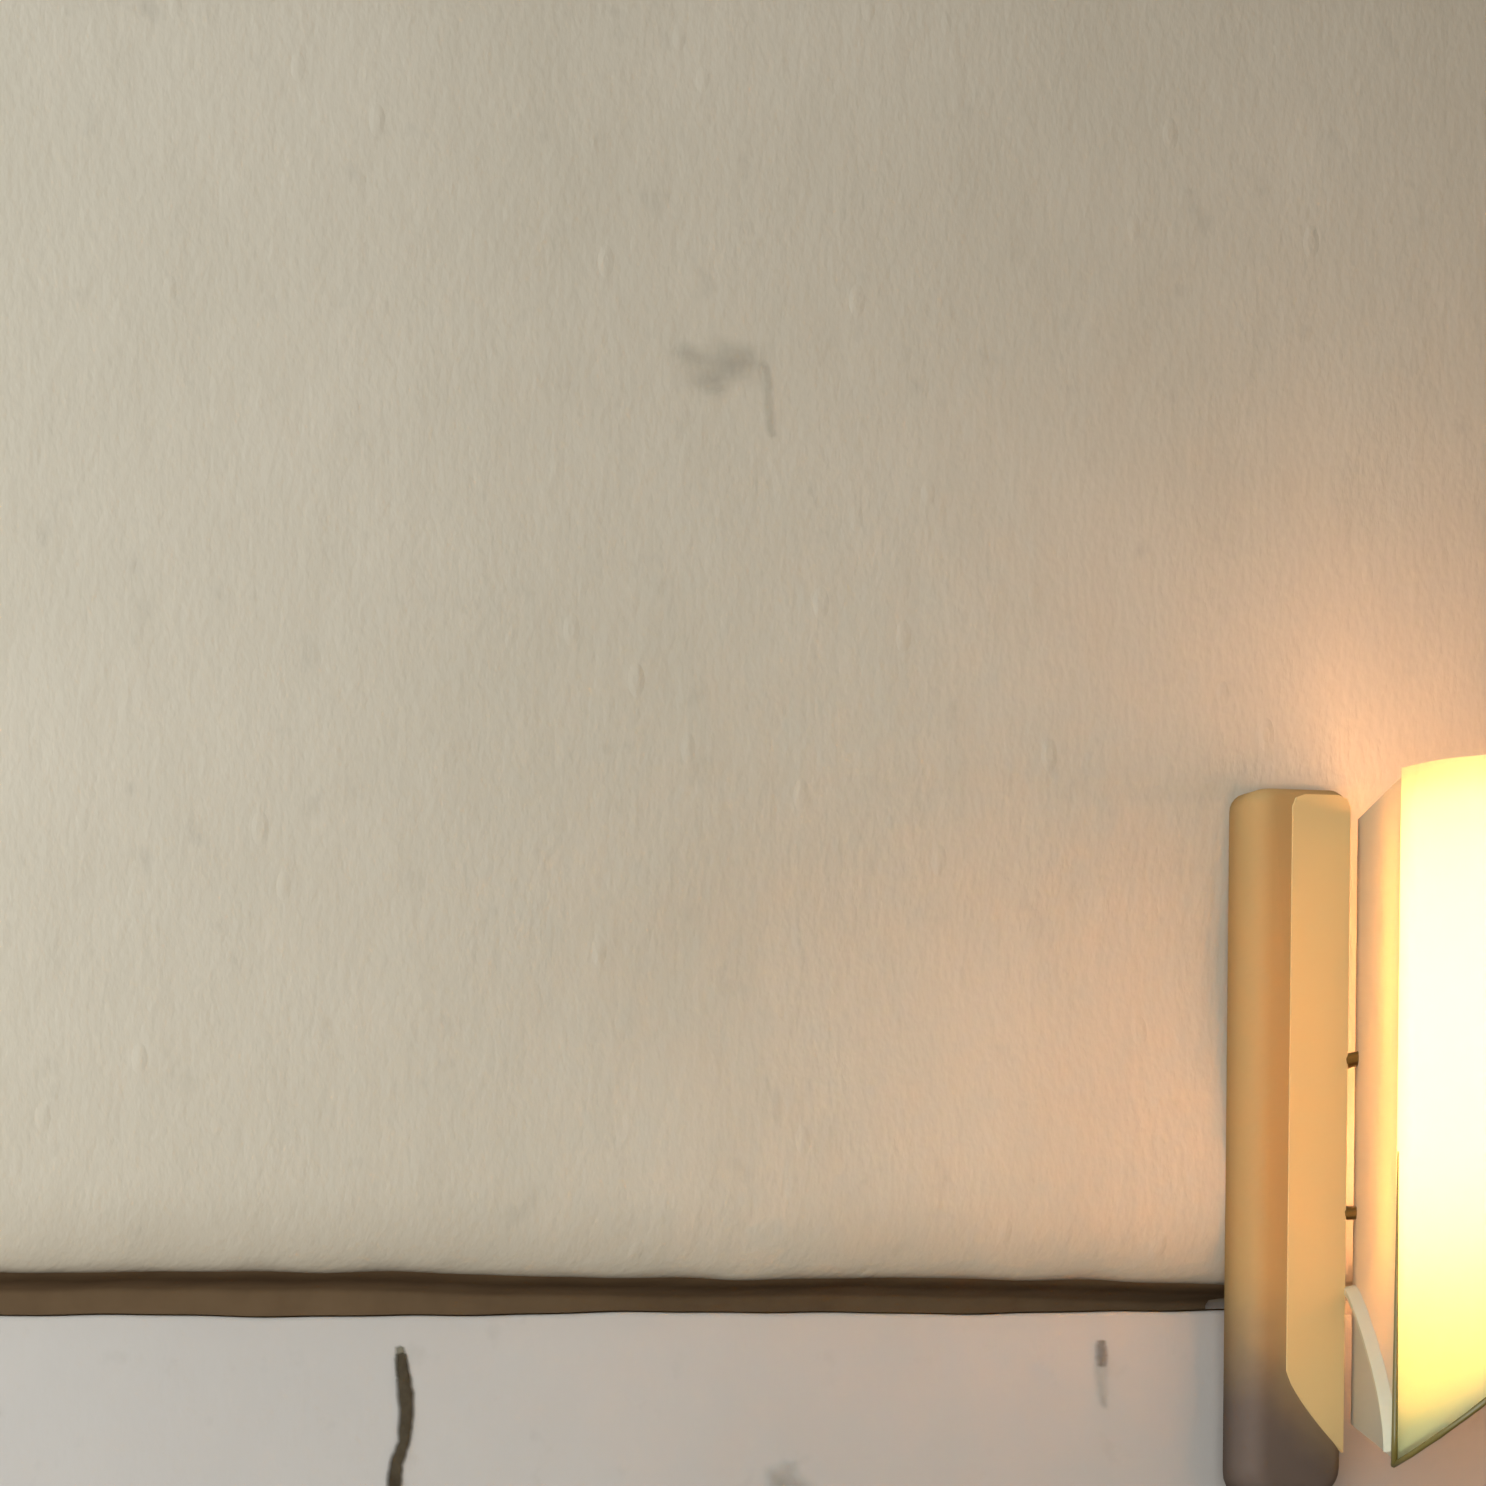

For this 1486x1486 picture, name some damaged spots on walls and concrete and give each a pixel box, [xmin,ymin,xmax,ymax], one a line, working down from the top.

crack [388,1346,414,1486]